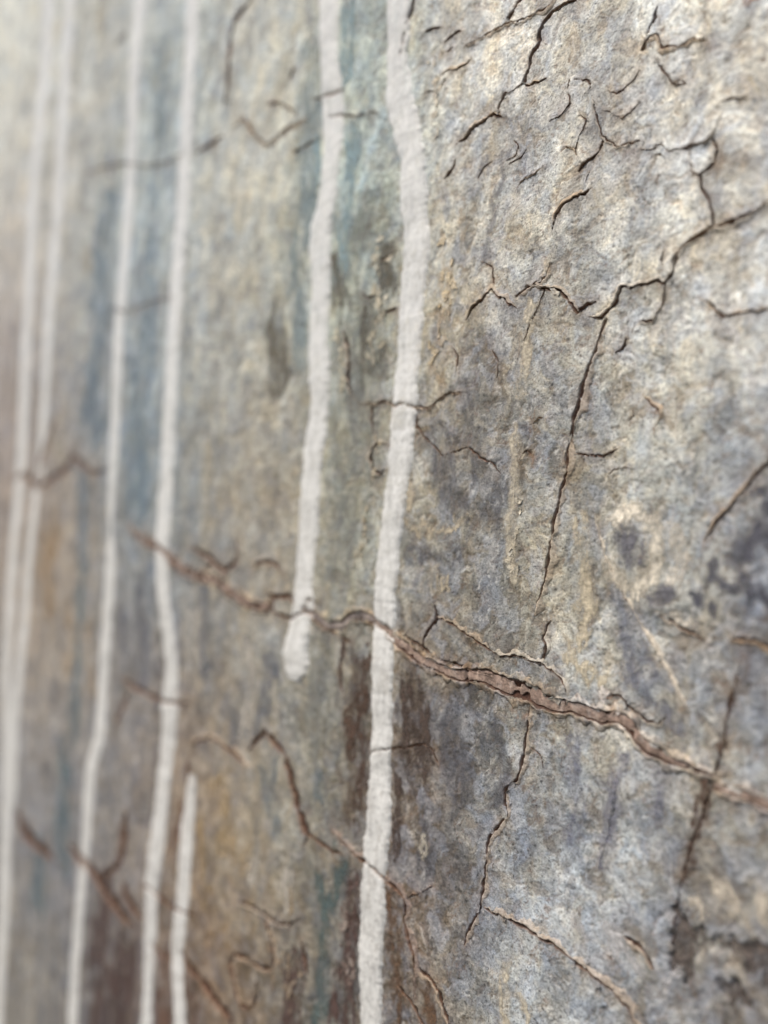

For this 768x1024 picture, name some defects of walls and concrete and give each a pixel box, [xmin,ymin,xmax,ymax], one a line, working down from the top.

crack [84,0,378,175]
water stain [339,4,354,91]
crack [401,0,577,179]
crack [640,6,710,86]
water stain [265,75,320,396]
water stain [330,126,361,324]
water stain [360,306,368,355]
water stain [379,243,395,296]
crack [127,70,768,1024]
crack [116,678,188,723]